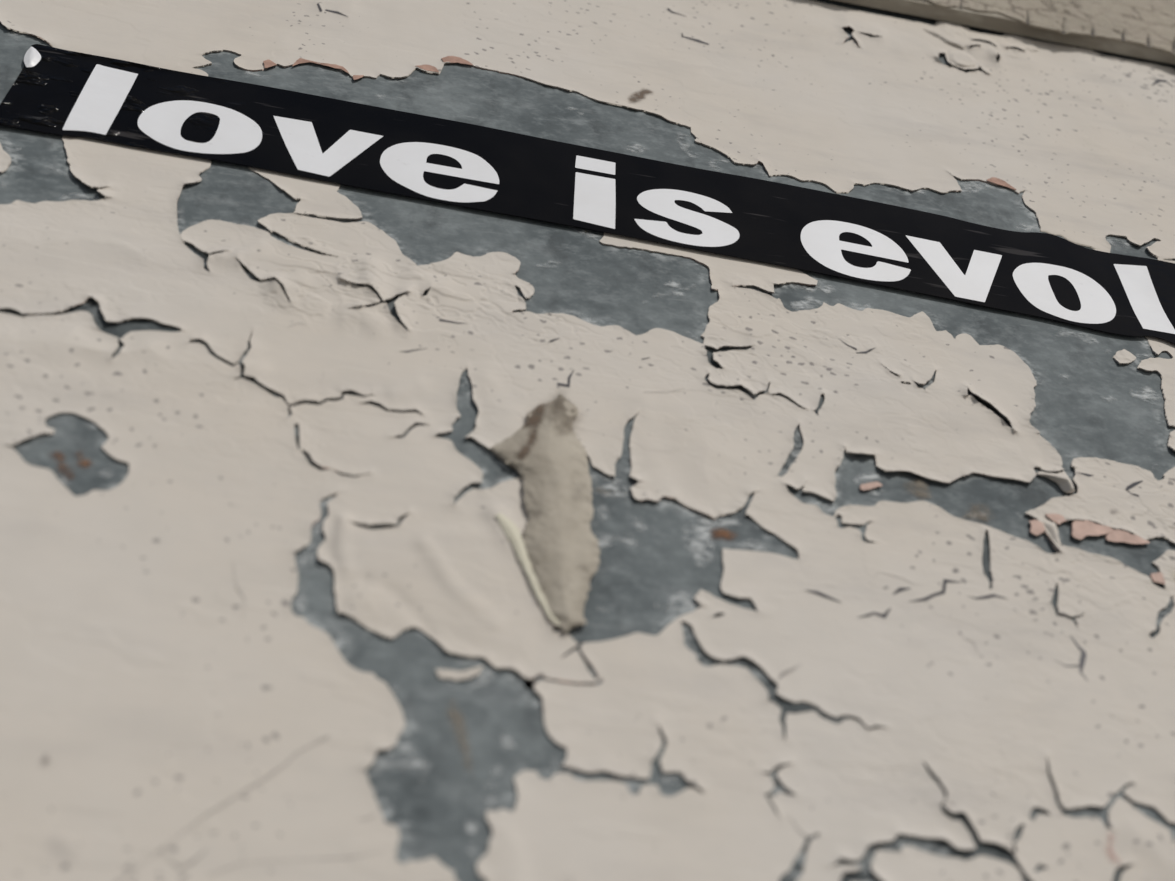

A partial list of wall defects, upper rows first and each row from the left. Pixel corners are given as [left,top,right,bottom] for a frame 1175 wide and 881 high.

crack [924,0,1175,87]
peeling [0,125,114,206]
peeling [195,49,1175,261]
peeling [3,414,129,496]
crack [0,293,428,477]
peeling [431,369,805,643]
peeling [173,160,1175,589]
crack [700,343,826,477]
crack [845,343,1019,435]
peeling [286,488,706,881]
crack [679,614,888,815]
crack [779,759,1049,881]